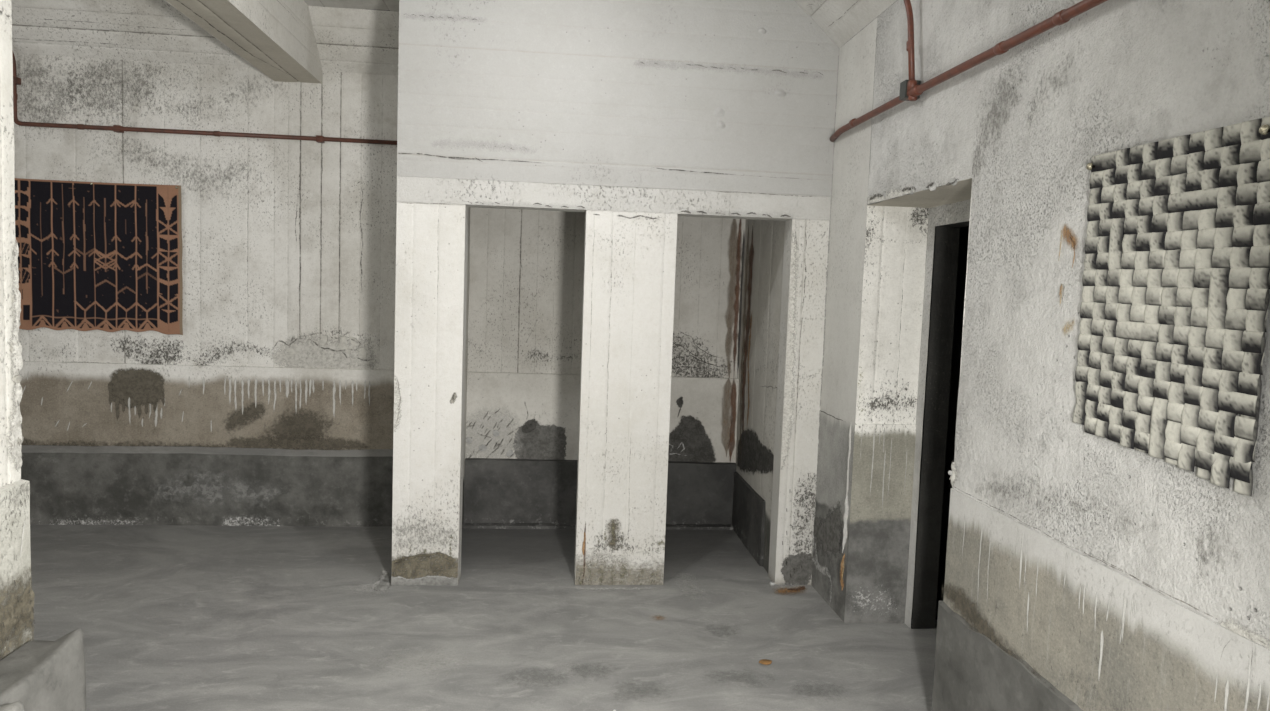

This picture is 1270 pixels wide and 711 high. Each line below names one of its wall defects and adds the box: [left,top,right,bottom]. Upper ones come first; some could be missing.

rust [1059,225,1076,268]
rust [722,219,754,461]
water stain [108,332,274,427]
water stain [21,377,370,450]
water stain [513,419,567,460]
water stain [668,415,716,463]
water stain [737,430,774,474]
water stain [865,382,916,412]
water stain [392,520,458,579]
water stain [781,473,849,607]
water stain [0,570,35,660]
water stain [943,523,1016,658]